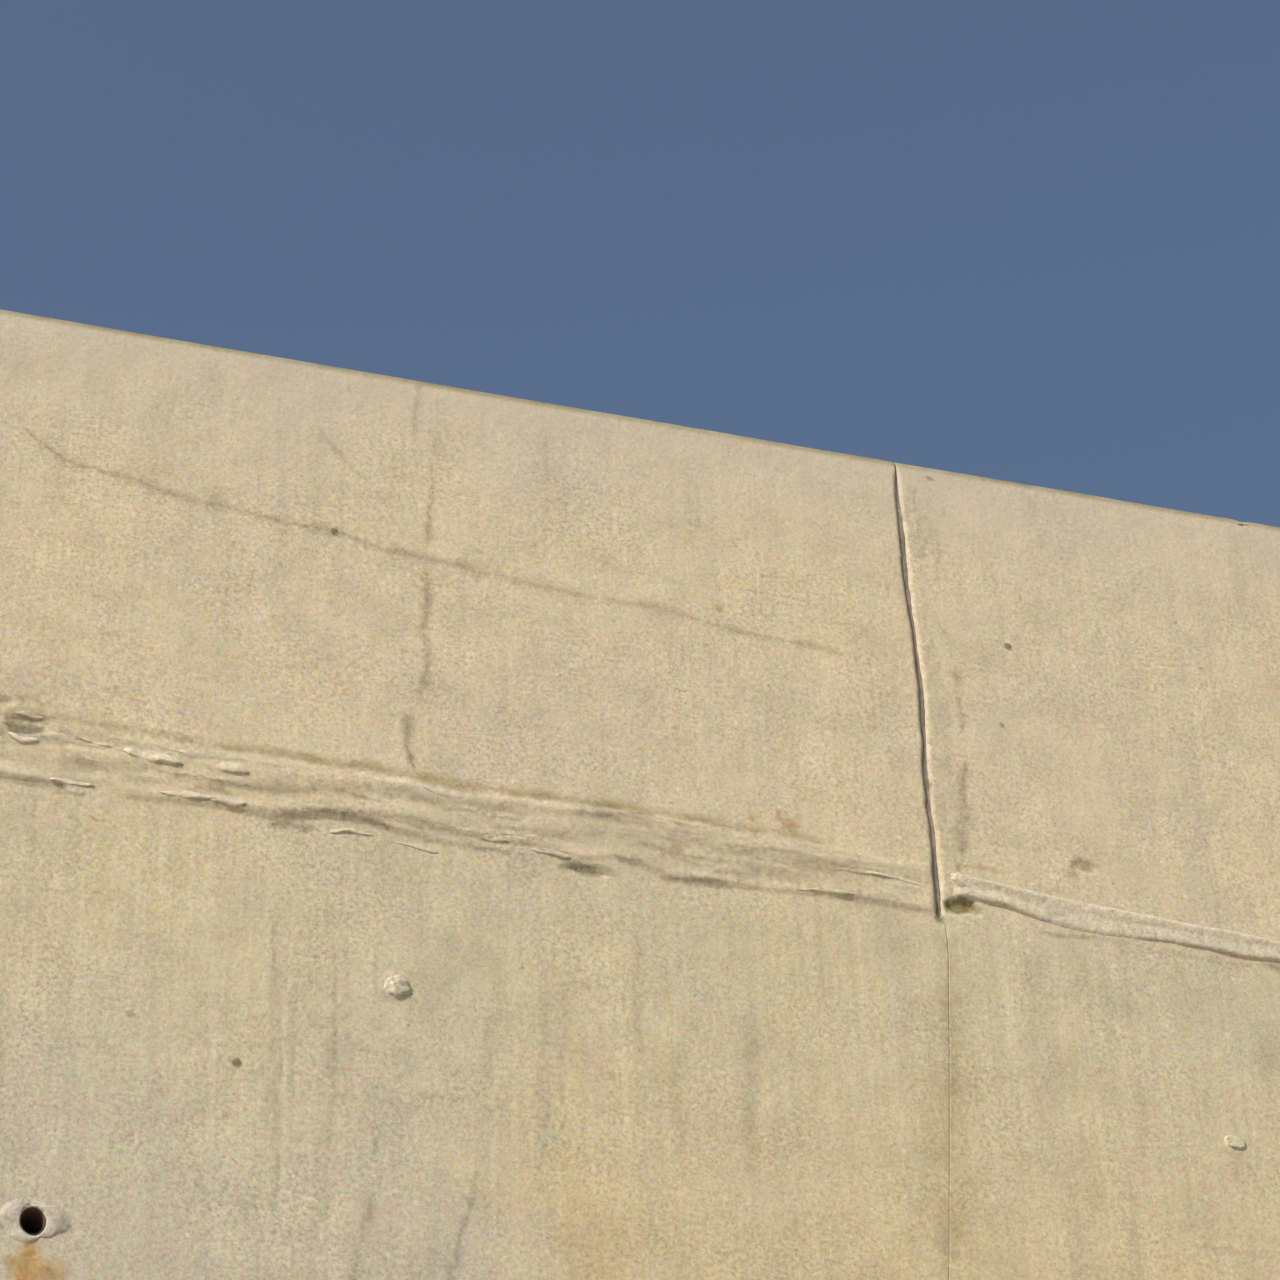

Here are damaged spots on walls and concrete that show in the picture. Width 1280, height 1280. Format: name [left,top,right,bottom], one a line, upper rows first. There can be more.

peeling [0,710,250,808]